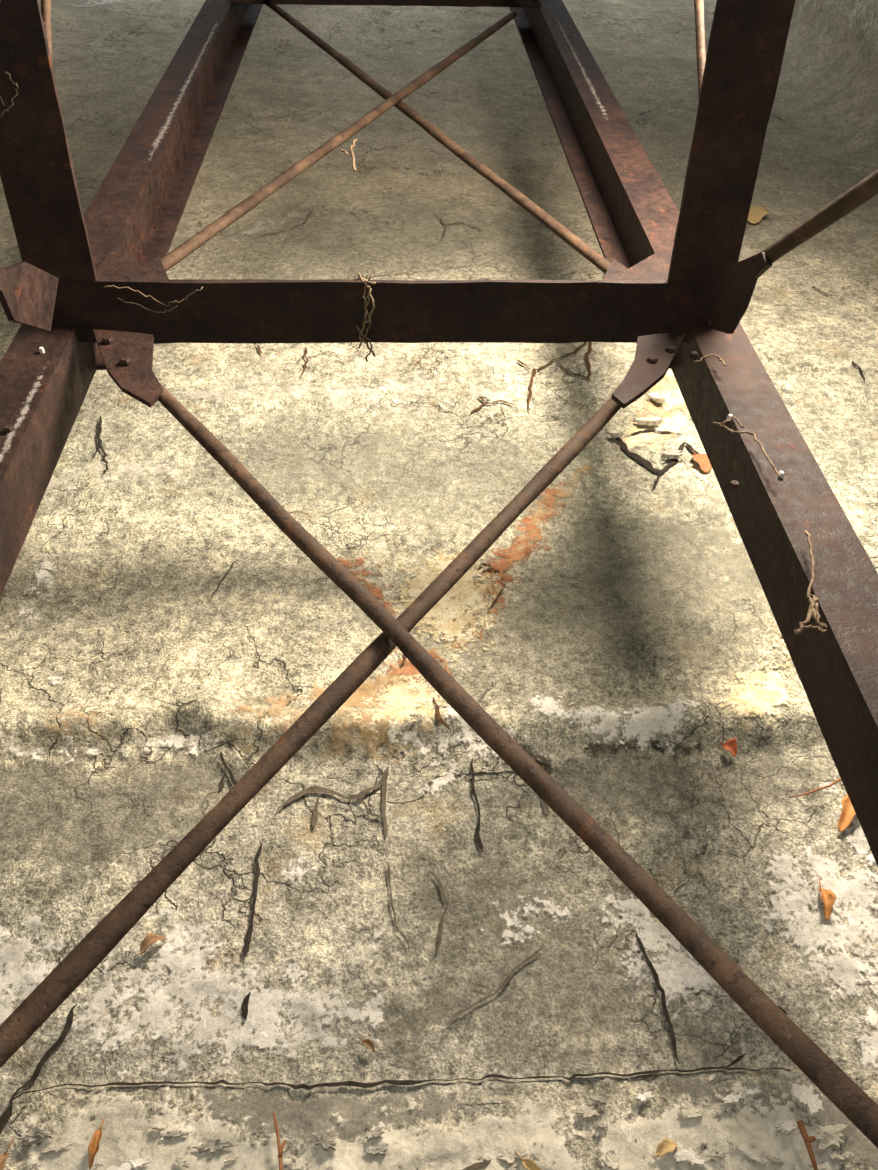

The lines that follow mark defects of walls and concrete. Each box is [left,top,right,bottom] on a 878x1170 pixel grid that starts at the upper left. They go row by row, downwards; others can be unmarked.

corrosion [630,376,686,424]
crack [615,429,700,489]
corrosion [336,552,407,615]
corrosion [427,465,593,675]
damp [529,630,800,754]
damp [387,705,503,794]
crack [241,841,262,956]
crack [0,932,790,1134]
crack [462,1160,491,1170]